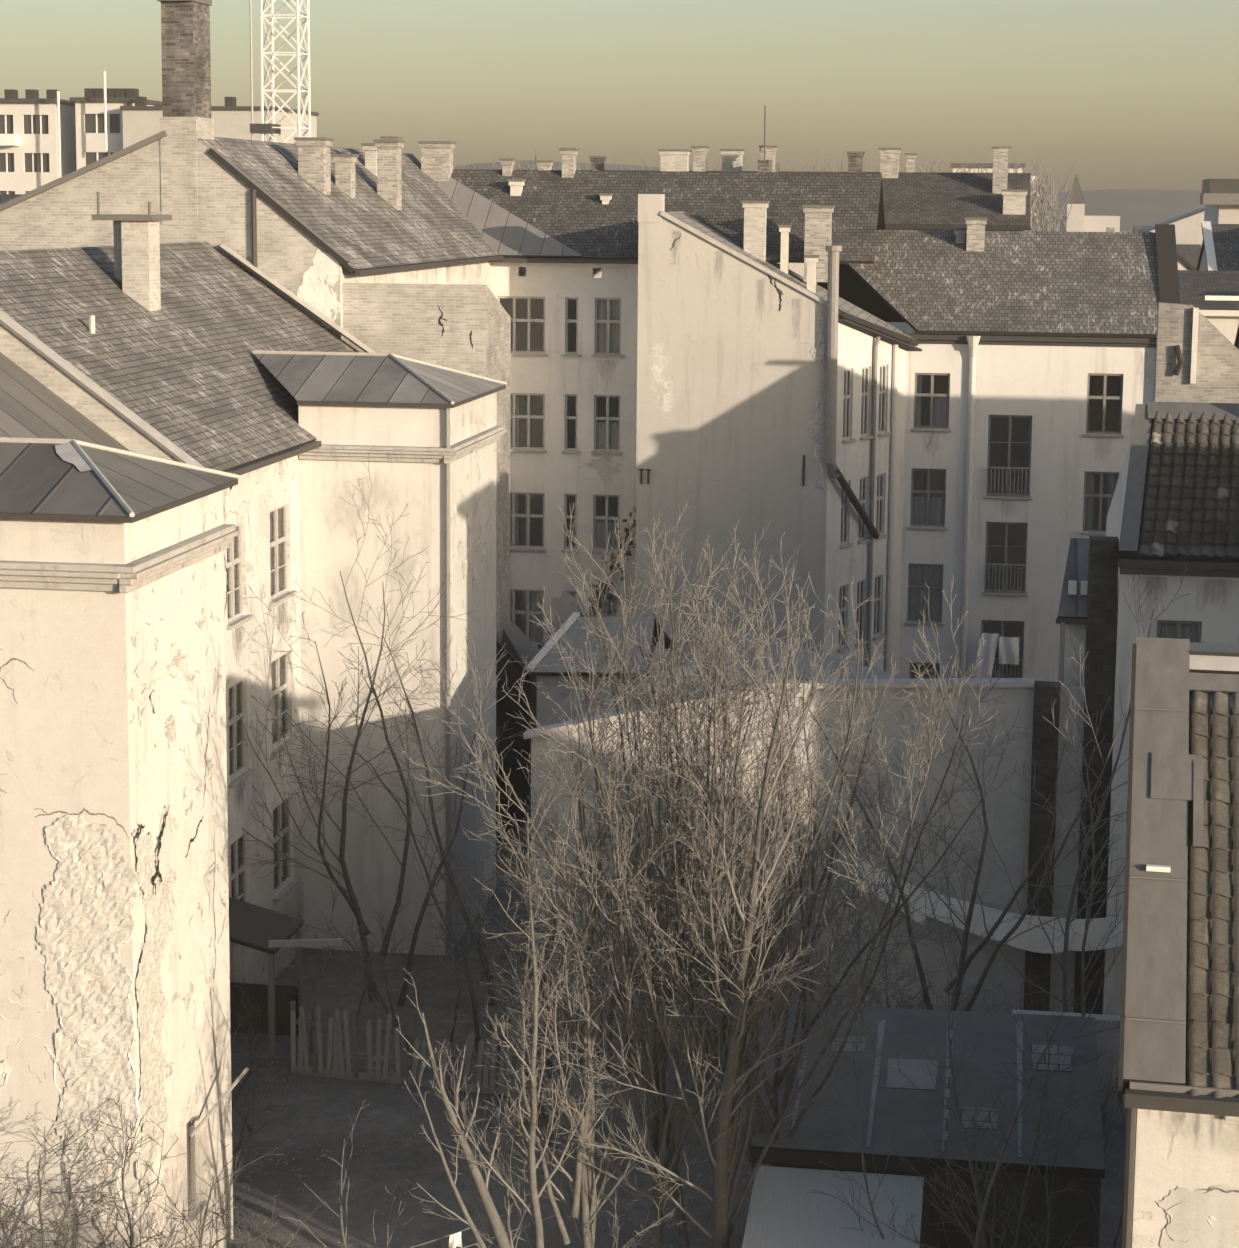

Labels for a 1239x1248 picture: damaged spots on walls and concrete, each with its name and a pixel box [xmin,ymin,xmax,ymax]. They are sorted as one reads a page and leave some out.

peeling [297,249,340,329]
crack [438,306,473,349]
crack [0,658,34,704]
crack [33,705,216,1001]
spalling [0,805,182,1230]